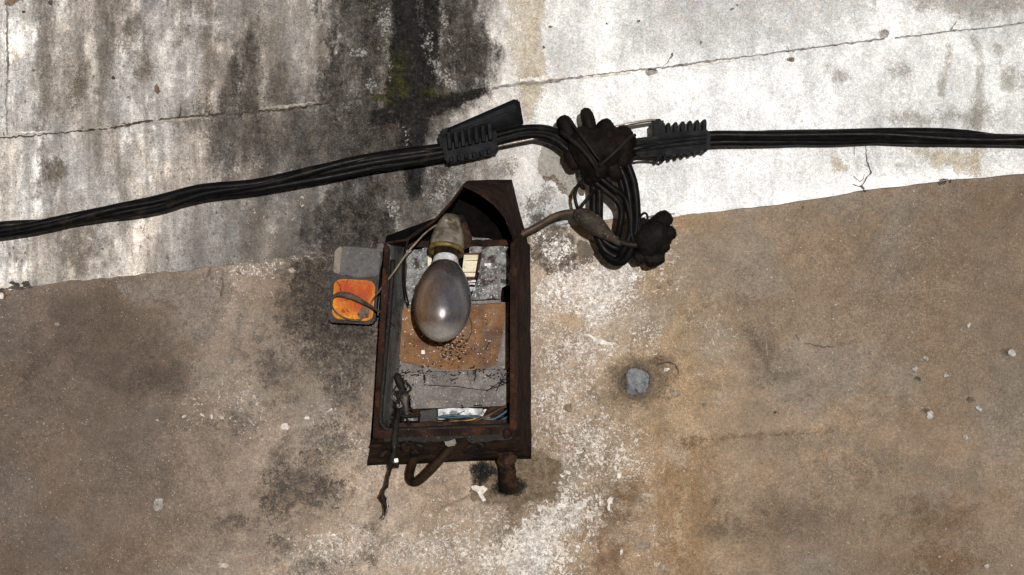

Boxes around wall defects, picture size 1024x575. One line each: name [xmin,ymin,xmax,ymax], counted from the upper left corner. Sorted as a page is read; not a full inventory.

water stain [99,0,151,78]
crack [0,0,388,139]
water stain [178,0,547,182]
crack [431,21,1024,103]
crack [853,146,872,192]